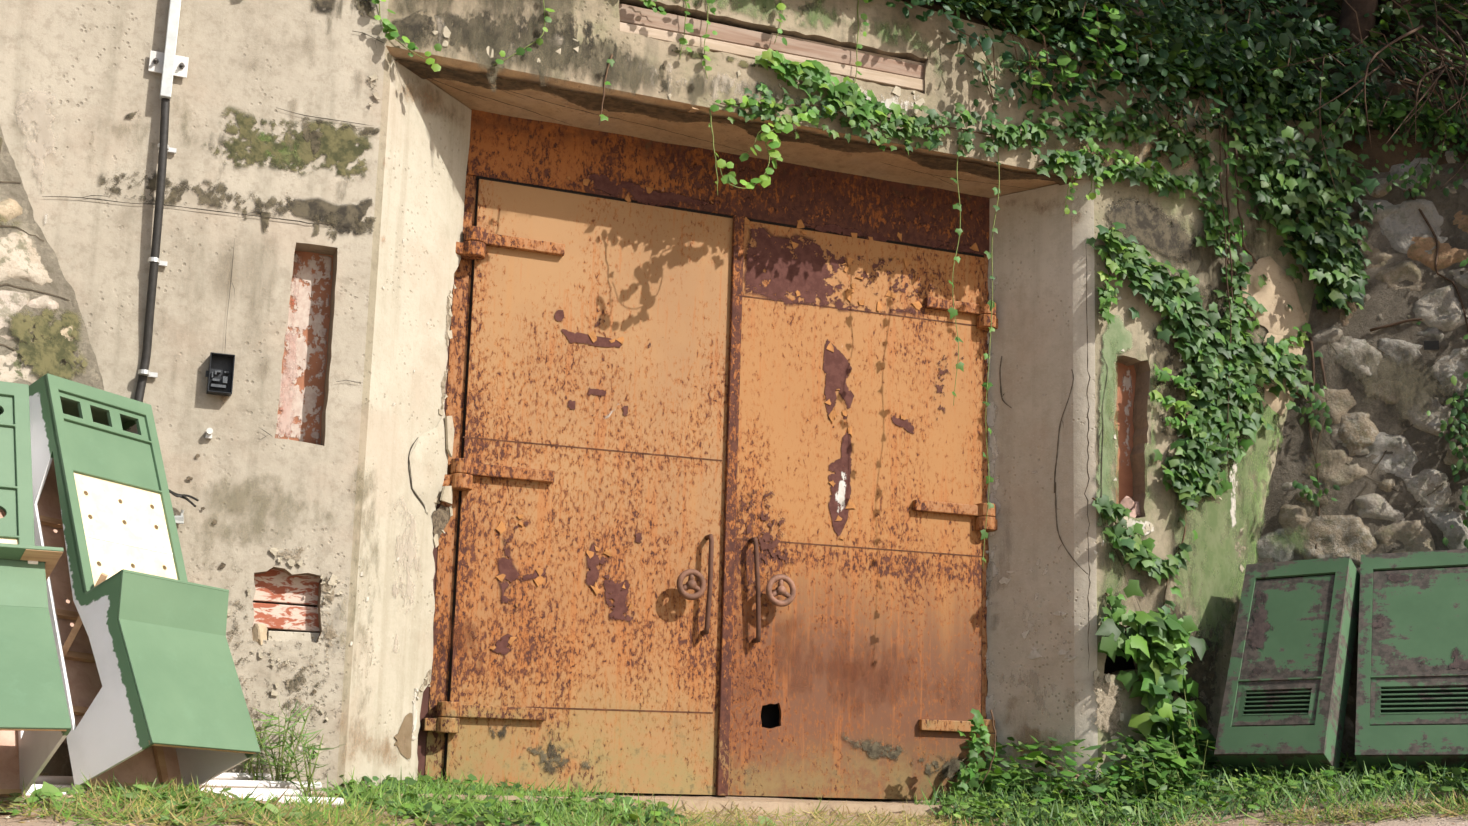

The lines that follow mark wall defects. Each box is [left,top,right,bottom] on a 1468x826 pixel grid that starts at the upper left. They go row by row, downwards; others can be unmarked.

water stain [312,0,375,19]
water stain [341,125,380,135]
water stain [393,0,668,93]
water stain [689,74,705,105]
water stain [100,172,376,243]
peeling [276,253,331,445]
corrosion [737,489,794,609]
crack [1054,254,1141,668]
peeling [1113,370,1132,481]
spalling [1119,496,1154,535]
water stain [1213,433,1244,527]
spalling [226,574,353,757]